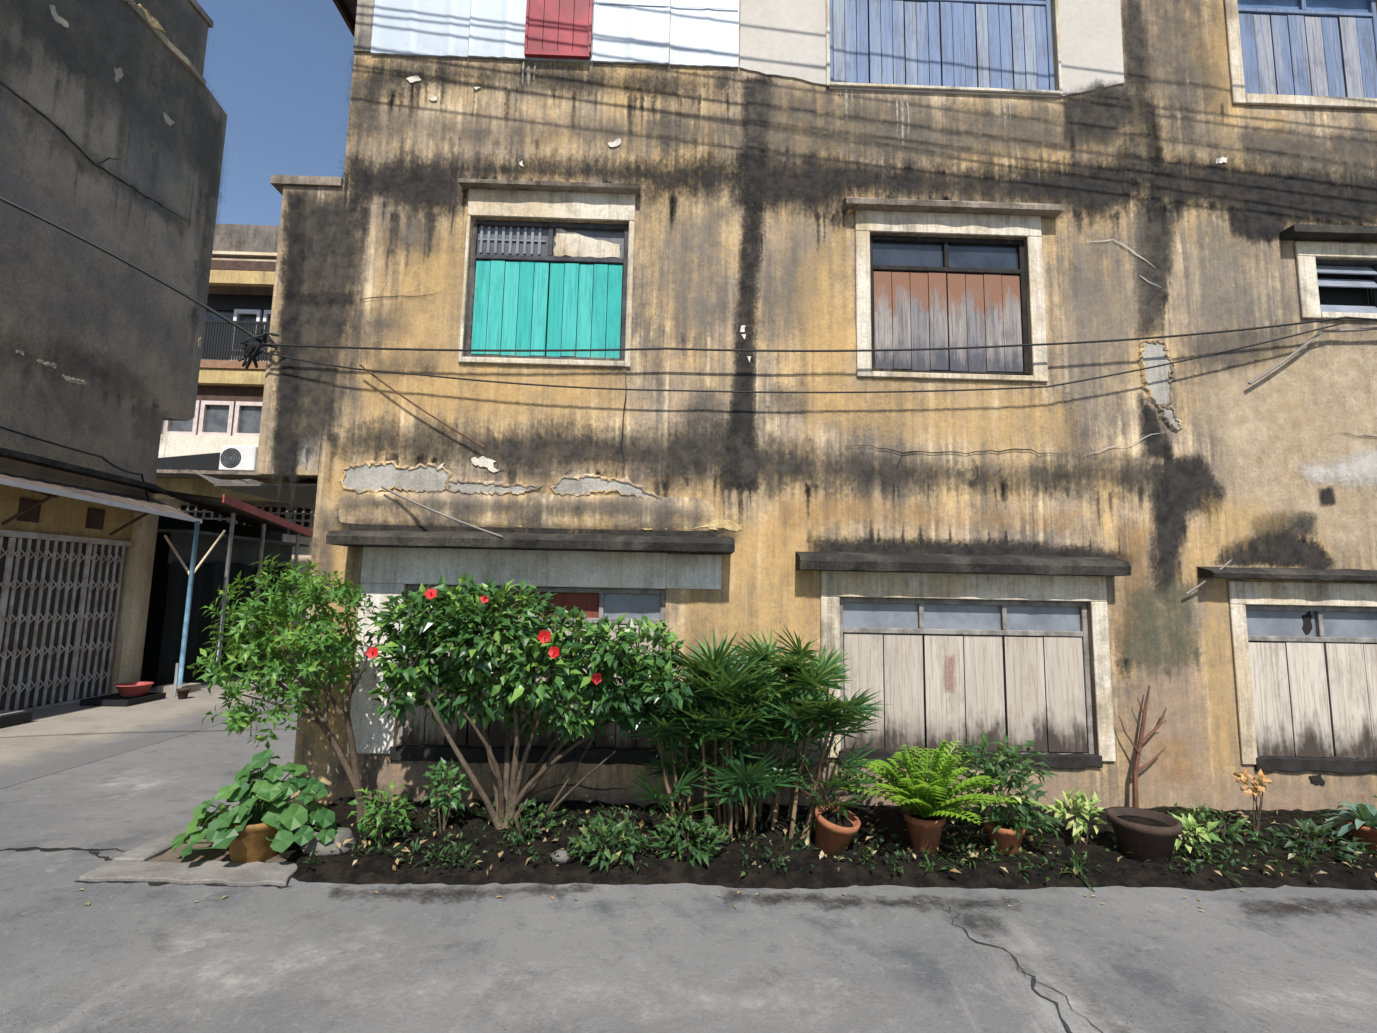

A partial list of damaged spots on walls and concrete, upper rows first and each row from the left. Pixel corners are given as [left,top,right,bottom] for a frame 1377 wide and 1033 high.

water stain [273,0,1377,767]
peeling [327,446,664,501]
crack [0,846,169,886]
crack [205,881,290,889]
crack [949,906,1072,1033]